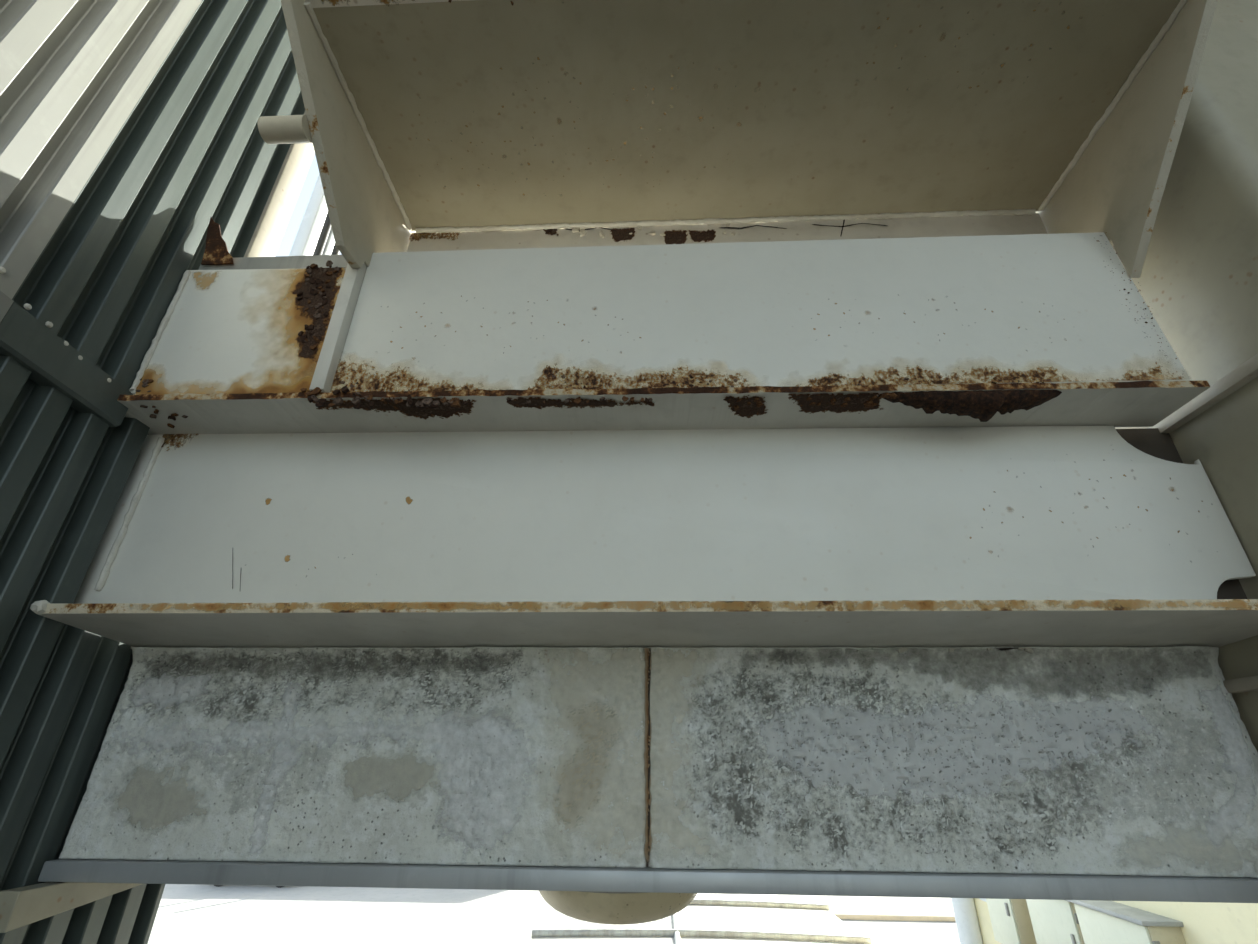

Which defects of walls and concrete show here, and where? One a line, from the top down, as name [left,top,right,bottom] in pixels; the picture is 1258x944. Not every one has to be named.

corrosion [131,260,490,451]
corrosion [507,365,767,419]
corrosion [789,367,1078,414]
corrosion [1097,252,1183,381]
corrosion [130,601,832,612]
corrosion [846,599,1249,611]
damp [134,658,267,709]
damp [134,684,527,854]
crack [644,648,652,863]
damp [760,648,1167,801]
damp [1202,687,1254,844]